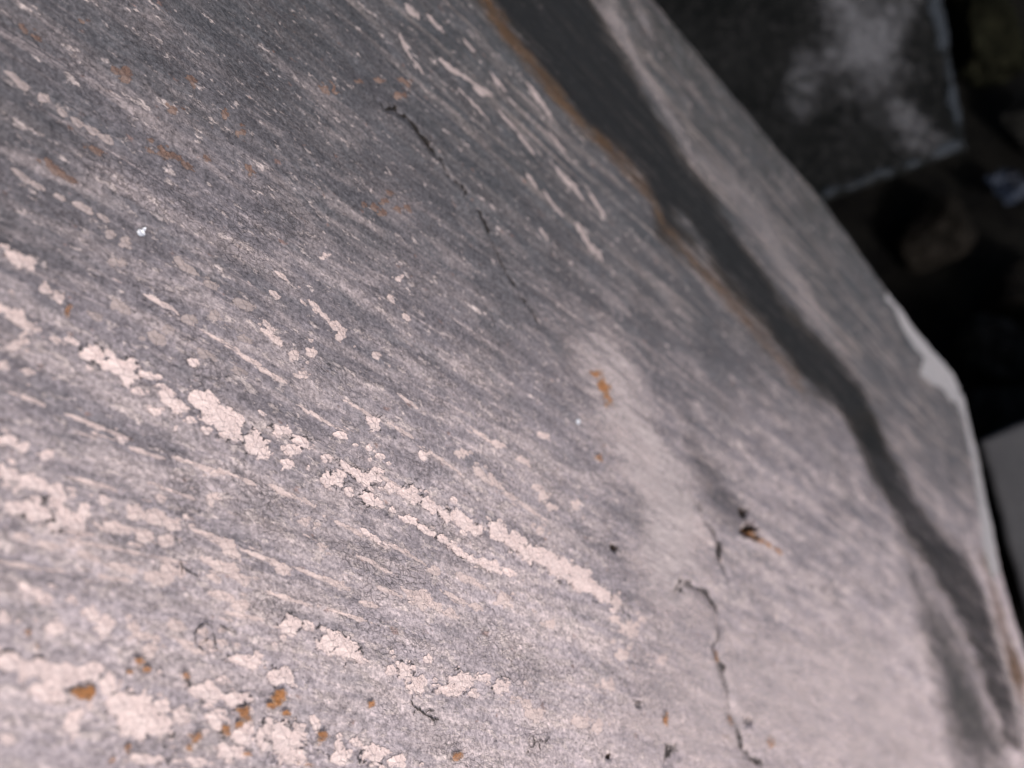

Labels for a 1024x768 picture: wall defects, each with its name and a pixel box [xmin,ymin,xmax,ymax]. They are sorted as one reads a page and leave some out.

crack [380,102,538,322]
peeling [0,244,38,271]
peeling [274,270,356,347]
rust [590,370,613,407]
peeling [0,294,648,662]
rust [740,528,782,555]
peeling [0,428,406,768]
crack [674,495,763,767]
rust [70,685,96,701]
rust [222,706,252,736]
rust [266,689,291,716]
peeling [385,650,546,724]